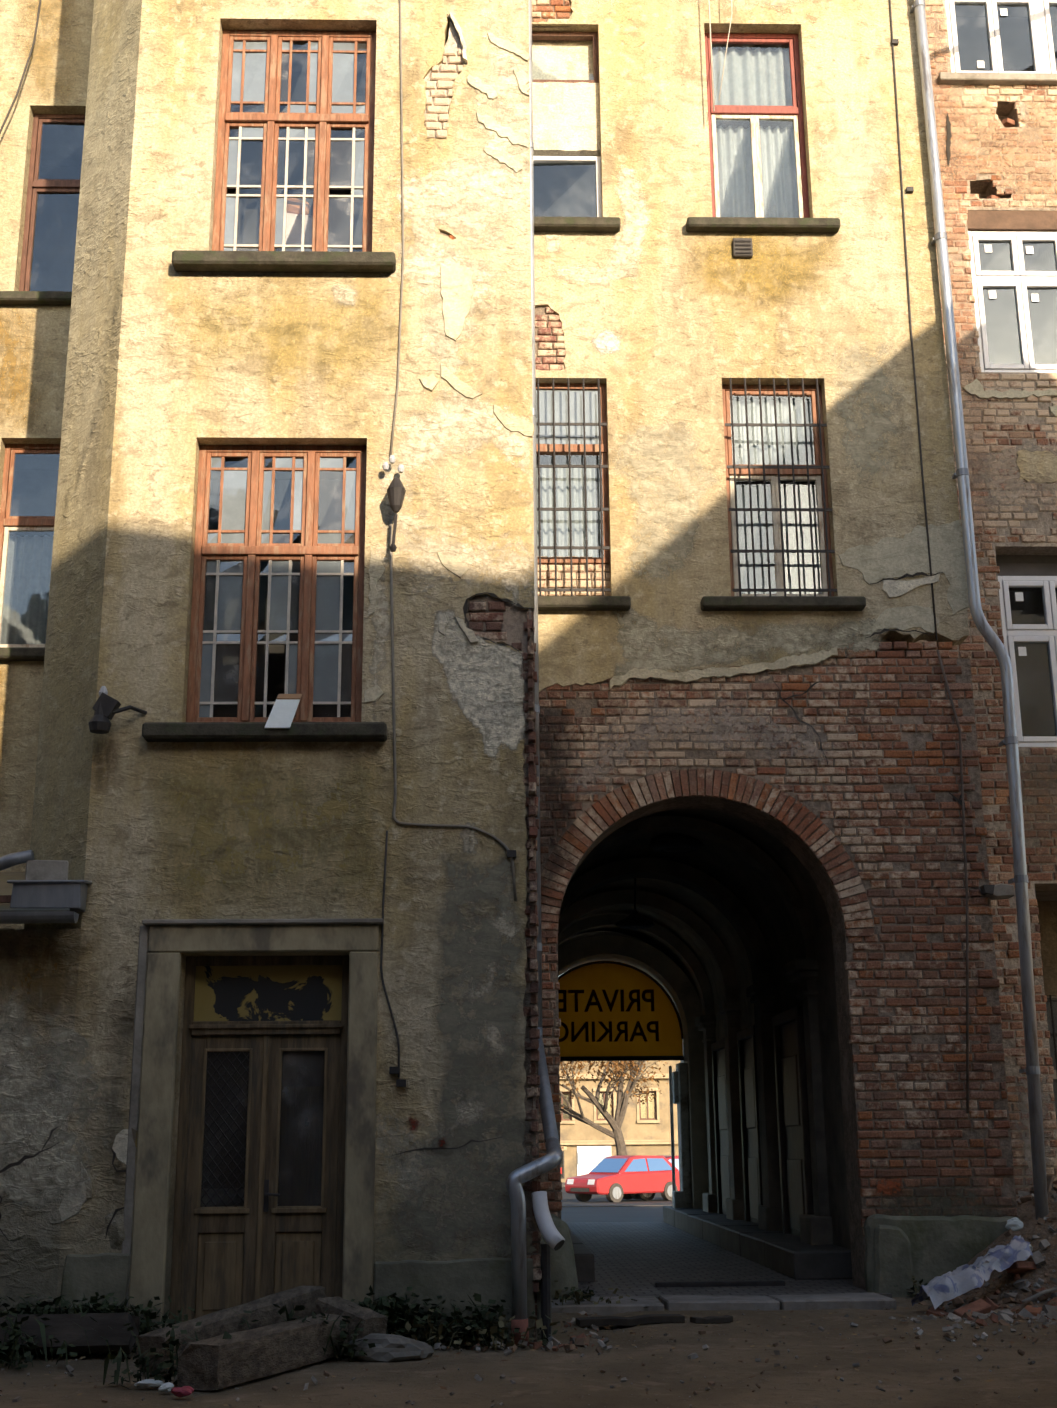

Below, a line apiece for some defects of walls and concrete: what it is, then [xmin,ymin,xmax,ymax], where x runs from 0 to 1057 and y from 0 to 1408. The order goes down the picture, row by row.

spalling [532,0,572,29]
peeling [380,12,534,491]
peeling [543,232,562,252]
peeling [557,167,650,286]
spalling [535,306,566,371]
peeling [592,330,620,353]
peeling [962,378,1057,399]
spalling [364,513,1018,1342]
crack [0,1126,59,1241]
peeling [882,1269,1057,1347]